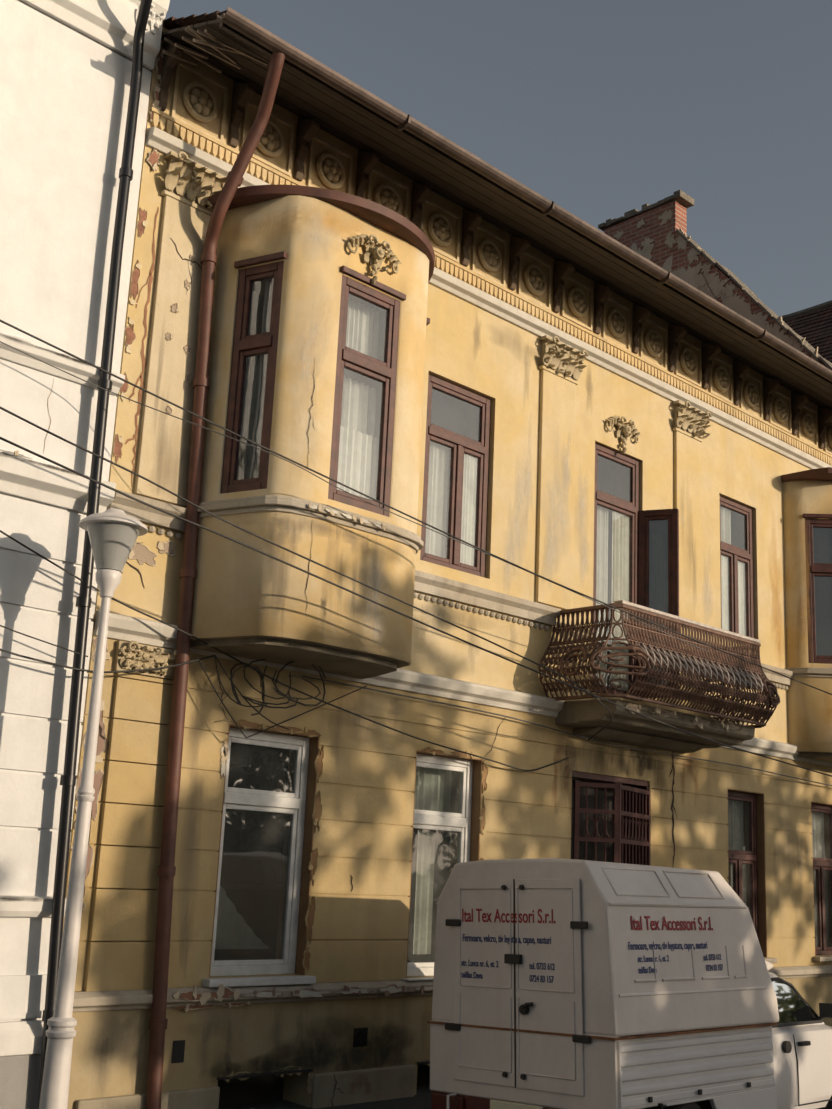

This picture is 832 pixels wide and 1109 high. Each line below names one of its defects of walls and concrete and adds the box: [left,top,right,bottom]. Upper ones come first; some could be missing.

peeling [136,207,149,238]
peeling [113,434,123,463]
peeling [119,373,129,402]
peeling [124,260,142,354]
crack [125,207,202,478]
crack [307,357,316,467]
peeling [614,210,821,363]
peeling [74,700,106,913]
peeling [220,740,228,780]
peeling [230,719,325,973]
peeling [173,984,433,1005]